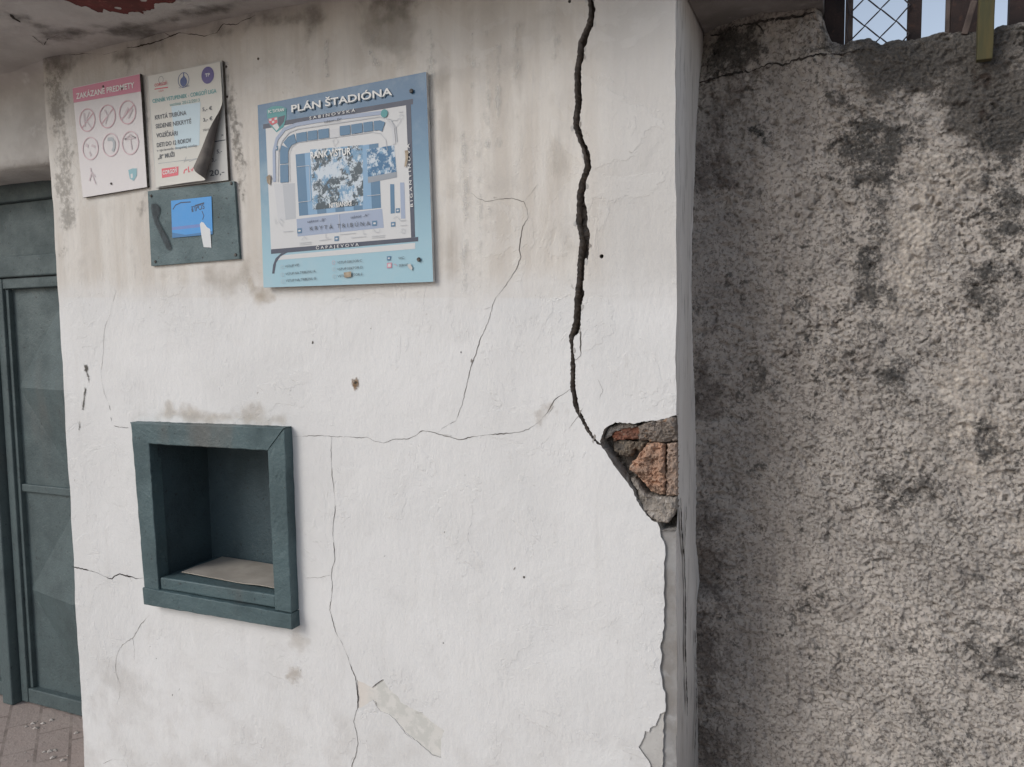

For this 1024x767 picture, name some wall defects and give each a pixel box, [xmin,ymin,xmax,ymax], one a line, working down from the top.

peeling [59,0,183,16]
crack [10,14,255,55]
damp [707,19,769,74]
crack [710,12,815,37]
crack [699,48,870,84]
damp [829,23,1024,330]
crack [295,0,605,765]
damp [876,358,909,401]
damp [937,347,1022,484]
crack [73,566,140,579]
spalling [600,415,680,767]
peeling [357,680,444,758]